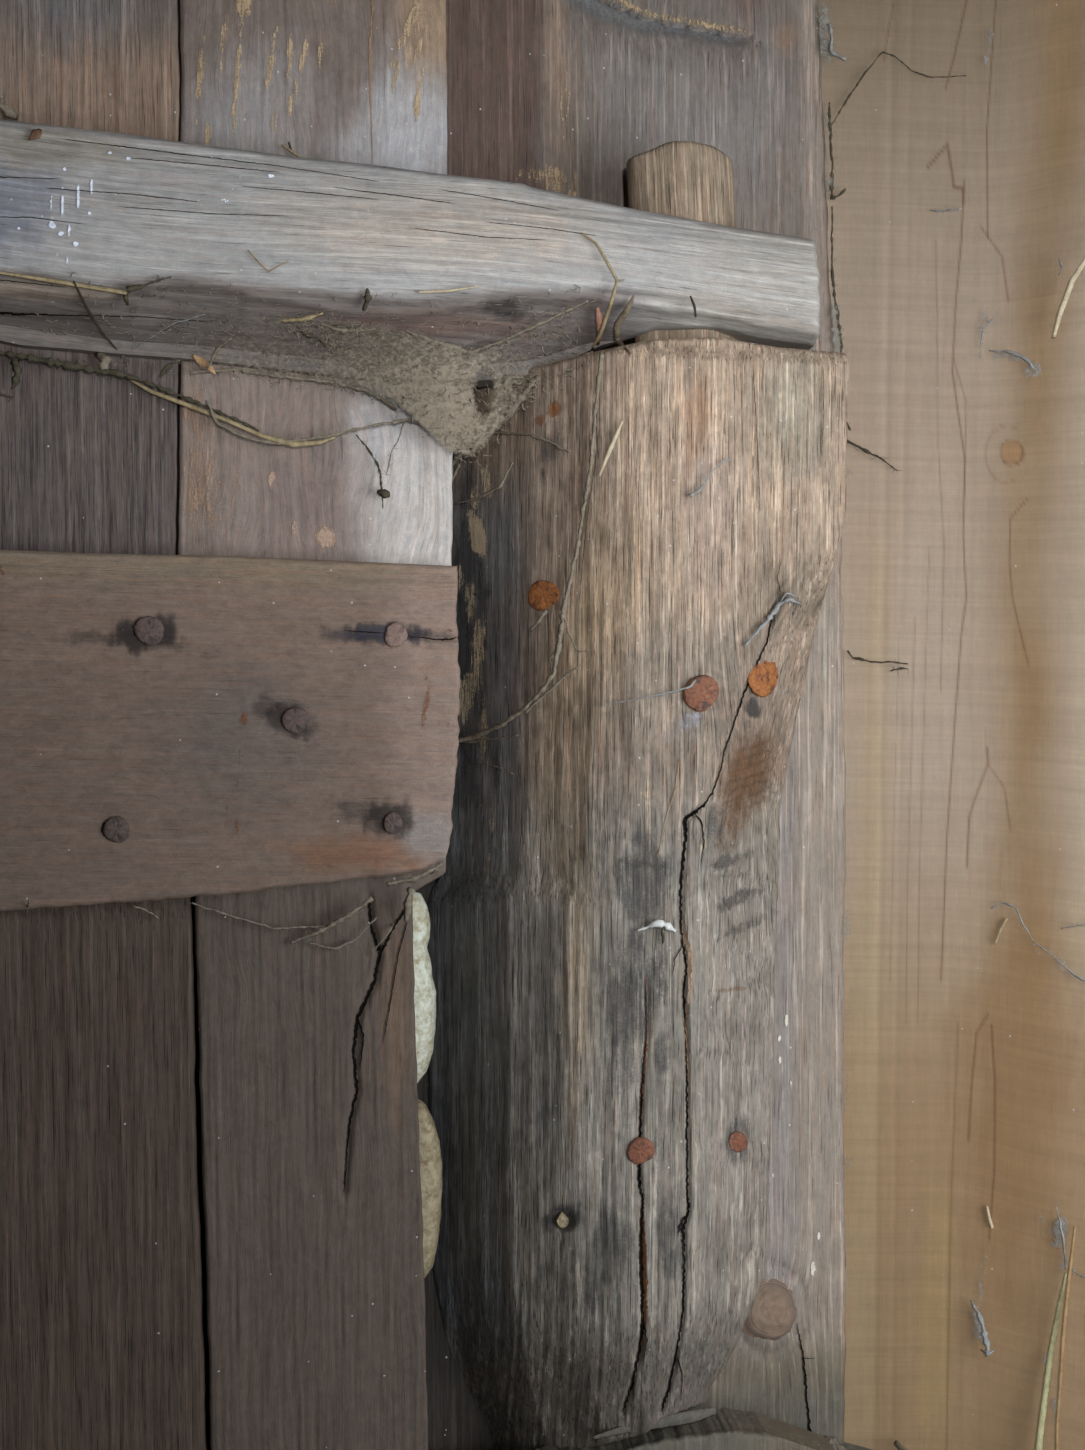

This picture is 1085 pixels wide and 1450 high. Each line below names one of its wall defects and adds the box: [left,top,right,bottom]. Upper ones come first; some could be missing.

crack [623,559,782,1412]